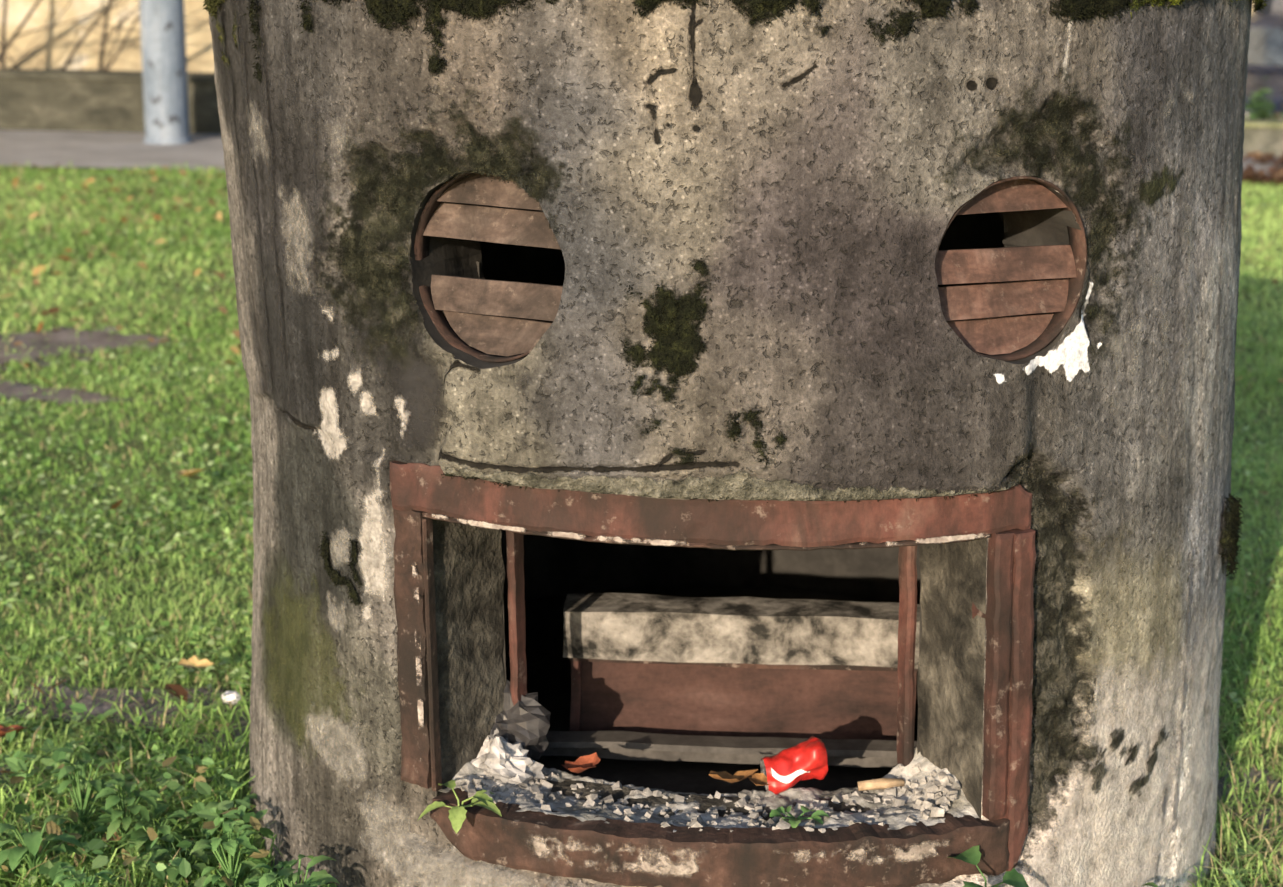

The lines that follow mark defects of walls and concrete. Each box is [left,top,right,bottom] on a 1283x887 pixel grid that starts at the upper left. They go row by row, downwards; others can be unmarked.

spalling [936,70,1151,366]
water stain [320,389,347,459]
water stain [350,373,375,414]
water stain [357,323,446,447]
water stain [1021,554,1224,887]
water stain [984,874,1007,887]